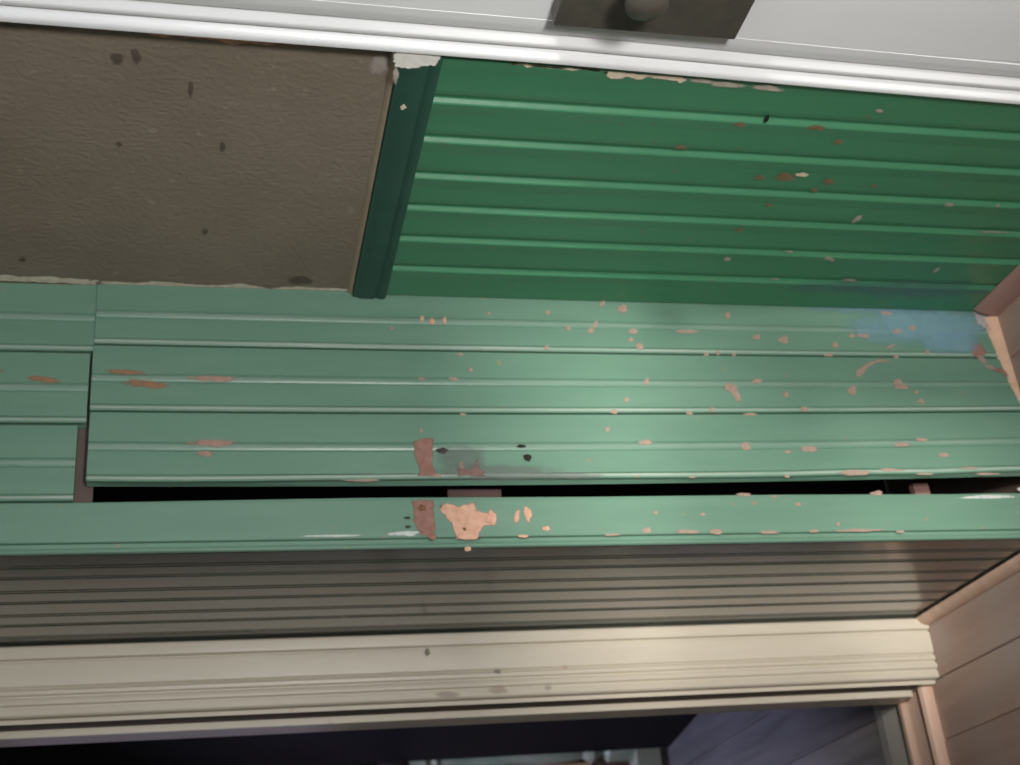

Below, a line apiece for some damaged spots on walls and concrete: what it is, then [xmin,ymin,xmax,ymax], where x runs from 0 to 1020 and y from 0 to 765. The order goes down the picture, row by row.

peeling [512,63,781,92]
peeling [778,172,809,180]
spalling [971,343,1009,377]
peeling [110,370,164,388]
peeling [724,383,741,401]
peeling [414,428,441,478]
peeling [412,499,497,551]
spalling [835,522,905,533]